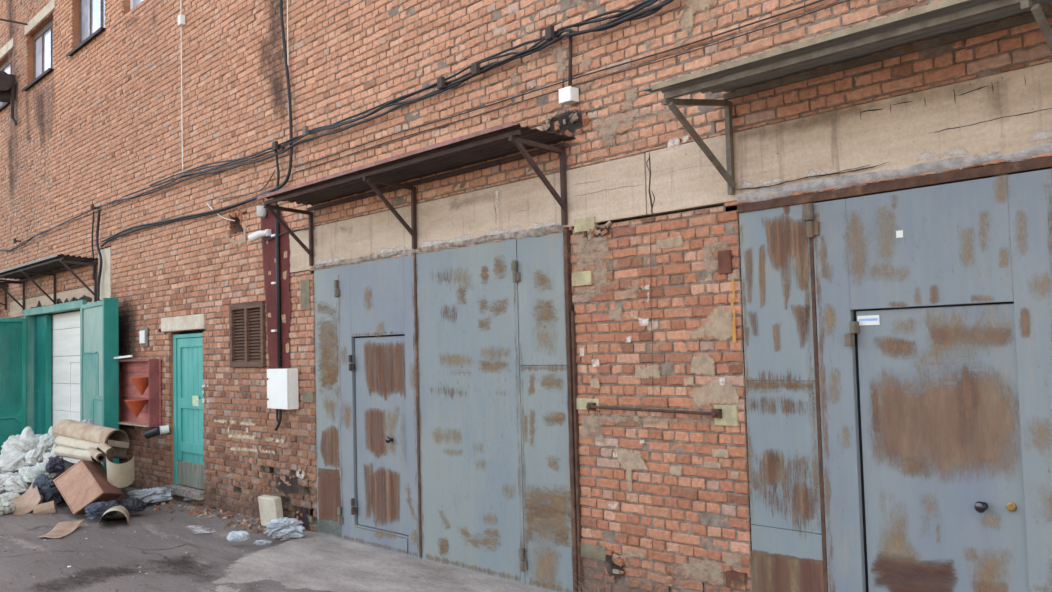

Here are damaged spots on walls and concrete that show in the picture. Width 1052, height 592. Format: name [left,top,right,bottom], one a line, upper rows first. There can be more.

crack [573,153,722,264]
crack [735,162,888,190]
corrosion [443,351,505,375]
corrosion [879,316,1009,364]
corrosion [1021,308,1029,336]
corrosion [316,304,357,541]
corrosion [356,314,423,549]
corrosion [746,364,839,503]
corrosion [871,369,1016,479]
corrosion [751,549,834,592]
corrosion [872,525,957,592]